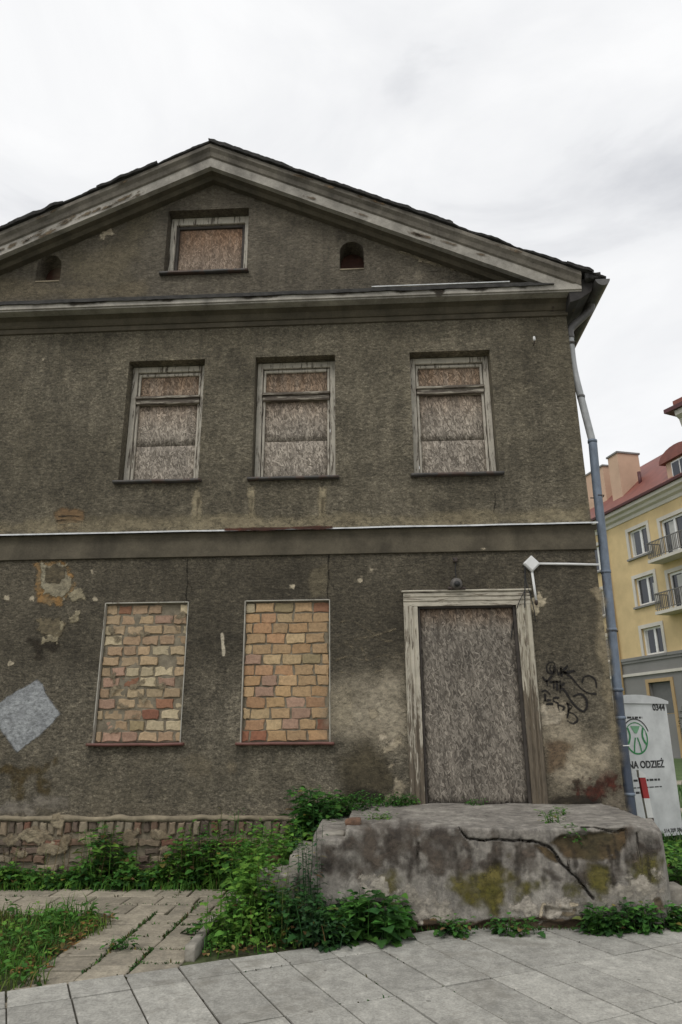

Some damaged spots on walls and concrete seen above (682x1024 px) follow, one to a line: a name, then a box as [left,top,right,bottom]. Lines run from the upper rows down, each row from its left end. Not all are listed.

flaking render [27,560,98,659]
crack [461,831,593,897]